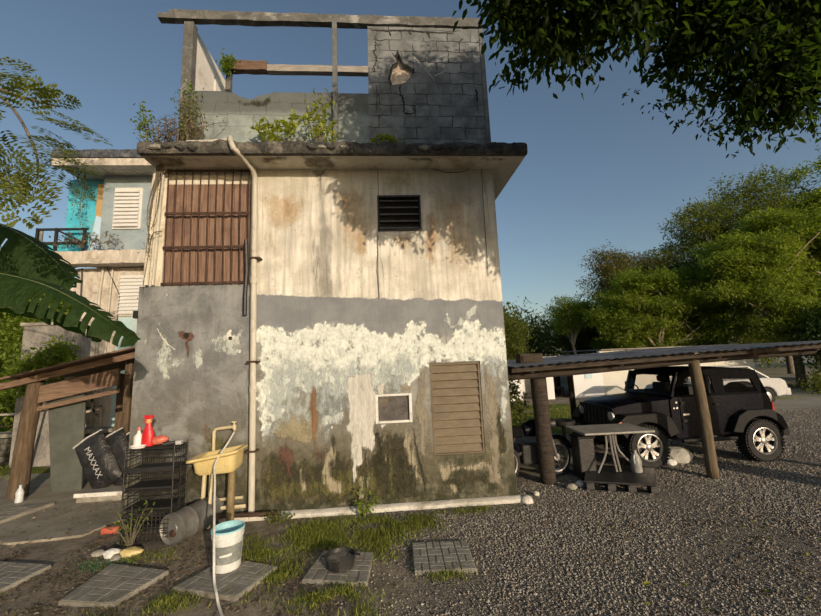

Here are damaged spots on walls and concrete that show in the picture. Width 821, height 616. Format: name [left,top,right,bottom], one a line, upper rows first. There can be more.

spalling [388,52,414,85]
crack [373,29,452,110]
crack [399,85,427,115]
peeling [157,329,183,379]
peeling [194,349,203,368]
peeling [212,330,242,356]
peeling [256,305,509,484]
rust [310,386,324,459]
damp [496,406,506,453]
damp [262,424,418,506]
damp [440,460,499,493]